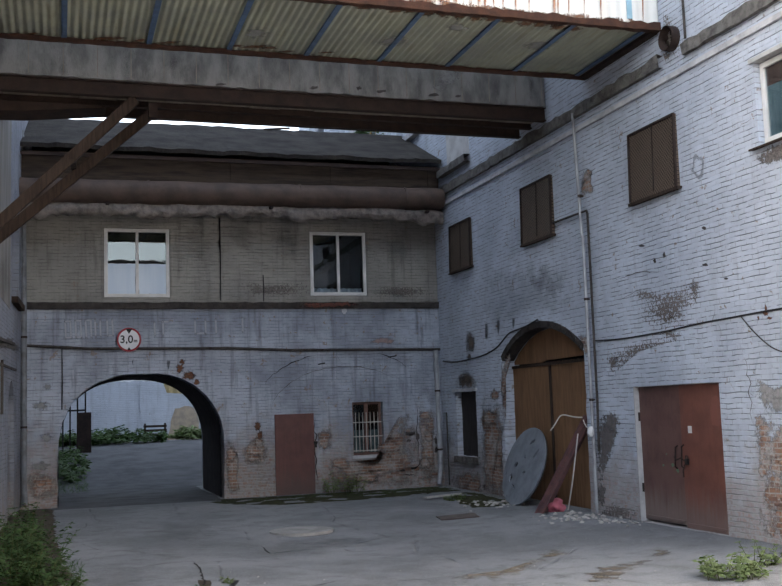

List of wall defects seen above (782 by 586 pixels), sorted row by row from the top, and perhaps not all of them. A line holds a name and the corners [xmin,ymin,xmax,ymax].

rust [343,0,633,31]
flaking render [330,412,438,485]
flaking render [452,354,511,495]
flaking render [755,416,782,536]
peeling [757,380,782,412]